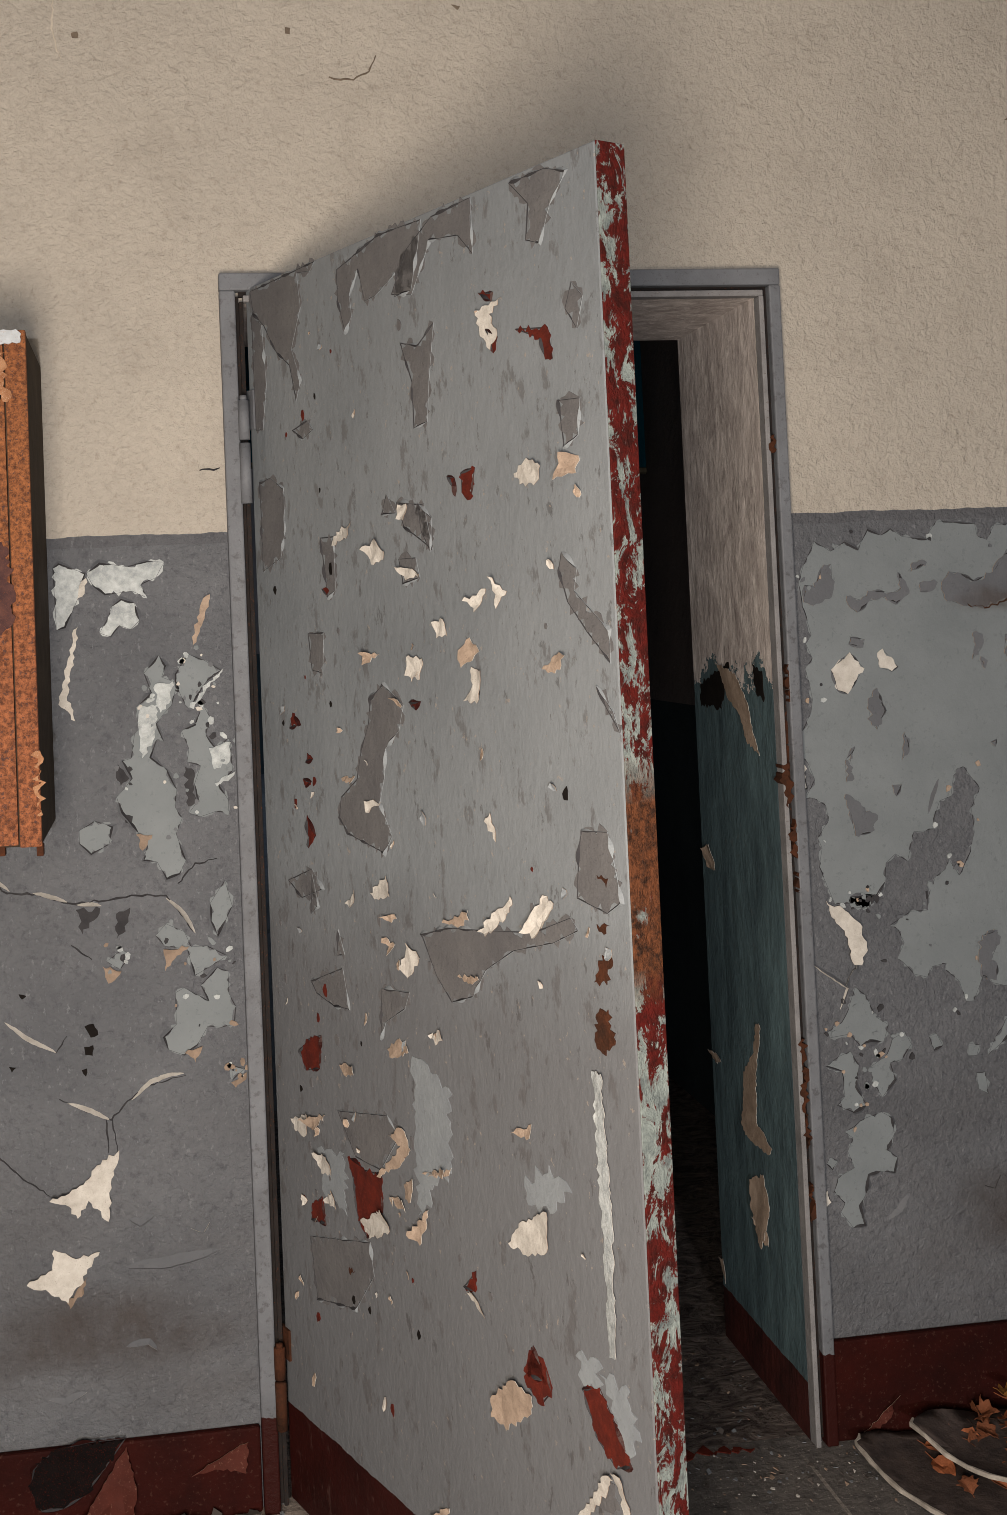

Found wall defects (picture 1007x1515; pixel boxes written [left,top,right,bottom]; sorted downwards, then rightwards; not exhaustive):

peeling [334,197,476,429]
peeling [474,298,500,350]
peeling [319,493,435,600]
peeling [51,559,164,721]
peeling [78,594,238,887]
peeling [338,644,423,858]
peeling [795,519,1007,1228]
peeling [155,880,239,1062]
peeling [288,823,625,1322]
peeling [0,1119,119,1222]
peeling [27,1250,100,1309]
peeling [576,1350,642,1458]